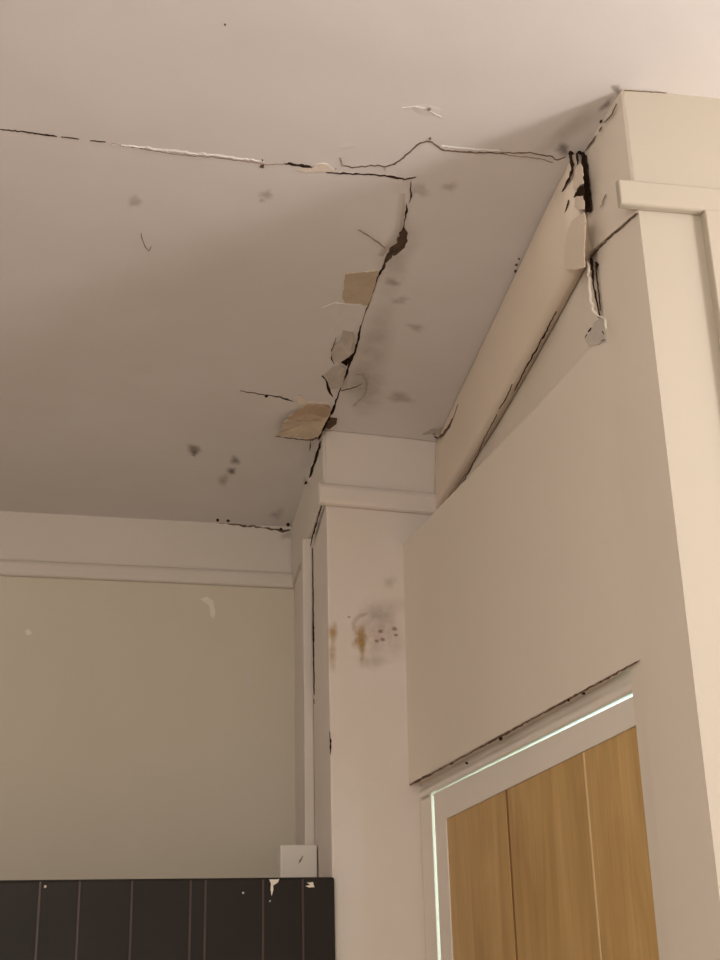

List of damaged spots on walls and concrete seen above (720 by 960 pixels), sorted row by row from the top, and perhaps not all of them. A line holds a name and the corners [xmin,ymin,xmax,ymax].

flaking render [562,151,592,213]
crack [0,90,666,484]
peeling [276,403,331,440]
crack [410,661,638,785]